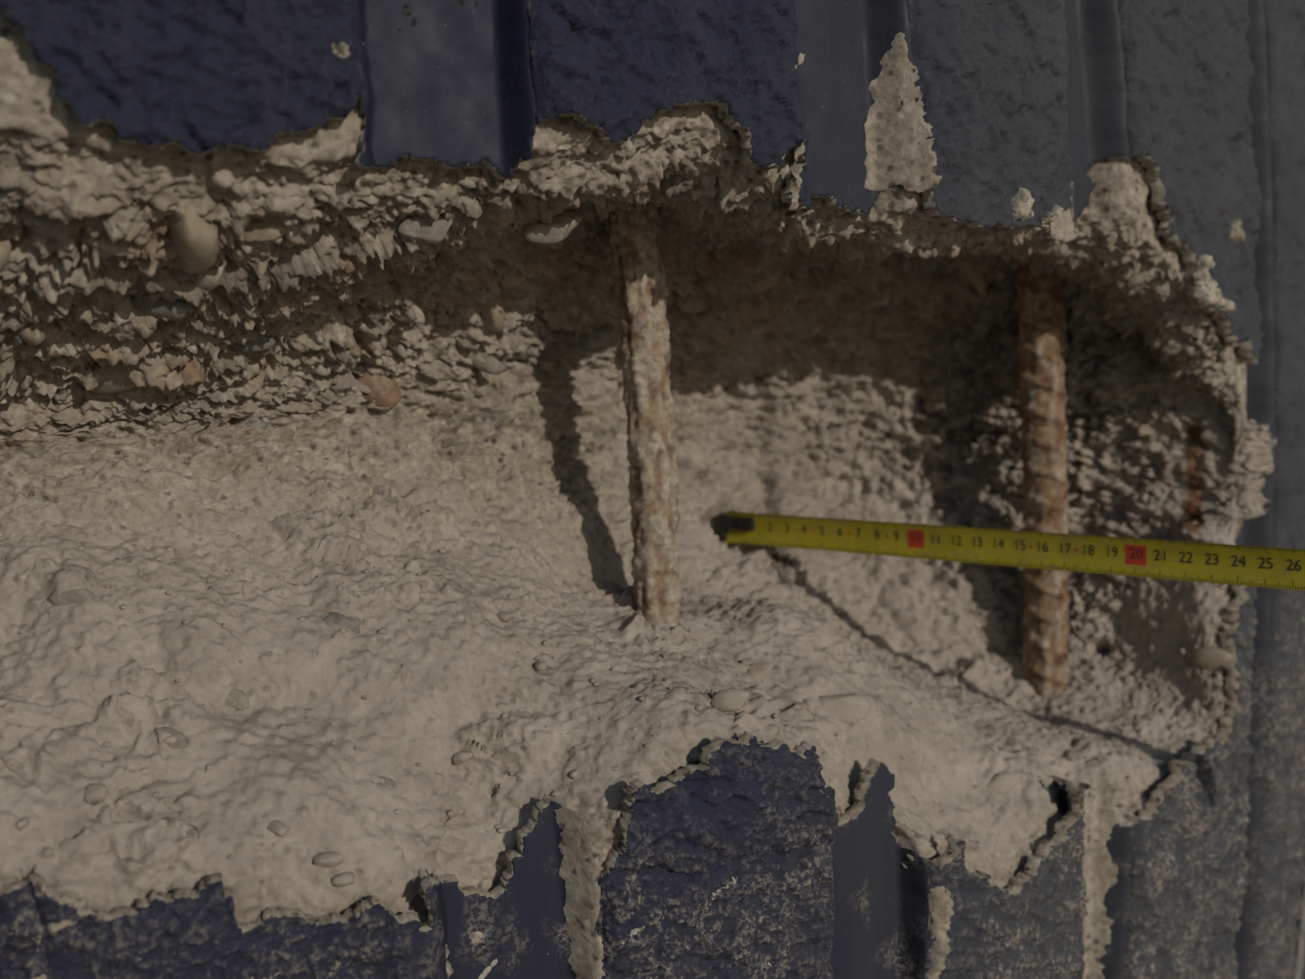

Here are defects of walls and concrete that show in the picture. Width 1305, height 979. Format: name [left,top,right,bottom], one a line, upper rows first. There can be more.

peeling [0,10,85,146]
spalling [167,204,220,274]
peeling [516,116,596,187]
peeling [639,105,732,162]
peeling [853,32,942,228]
peeling [1073,157,1160,243]
spalling [88,362,137,393]
spalling [609,205,683,627]
spalling [1016,262,1070,534]
spalling [1021,567,1071,699]
peeling [554,808,609,979]
peeling [1082,781,1120,979]